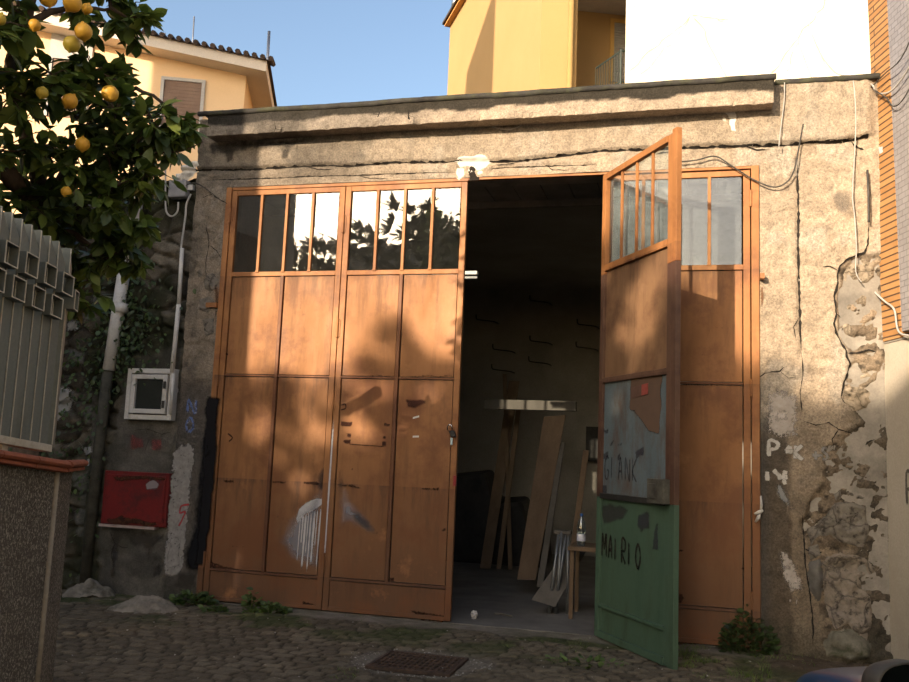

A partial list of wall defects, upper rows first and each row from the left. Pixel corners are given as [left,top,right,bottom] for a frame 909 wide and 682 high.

peeling [843,259,875,283]
flaking render [844,370,871,411]
crack [802,516,822,639]